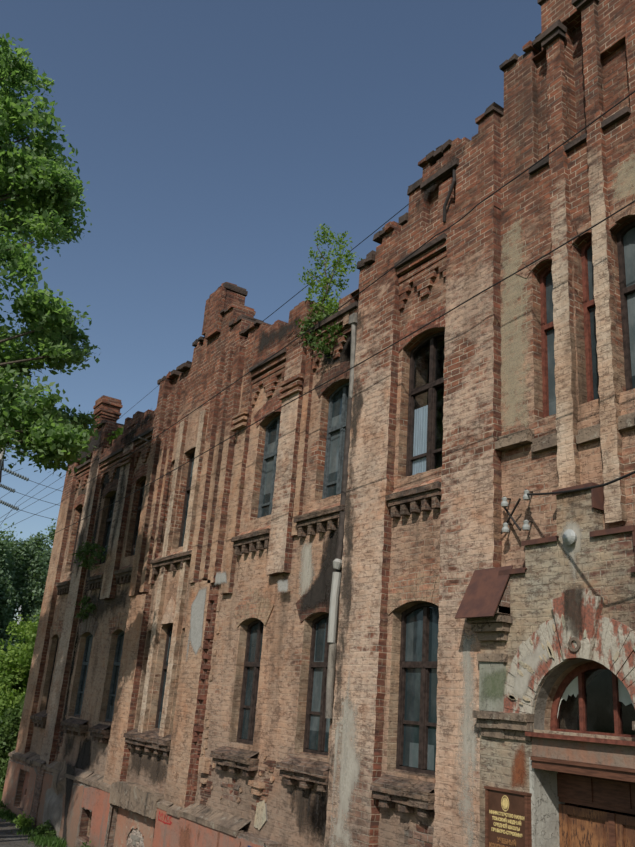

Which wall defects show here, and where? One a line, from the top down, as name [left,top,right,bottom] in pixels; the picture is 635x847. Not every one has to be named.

water stain [351,378,363,448]
water stain [291,463,360,847]
peeling [508,639,565,705]